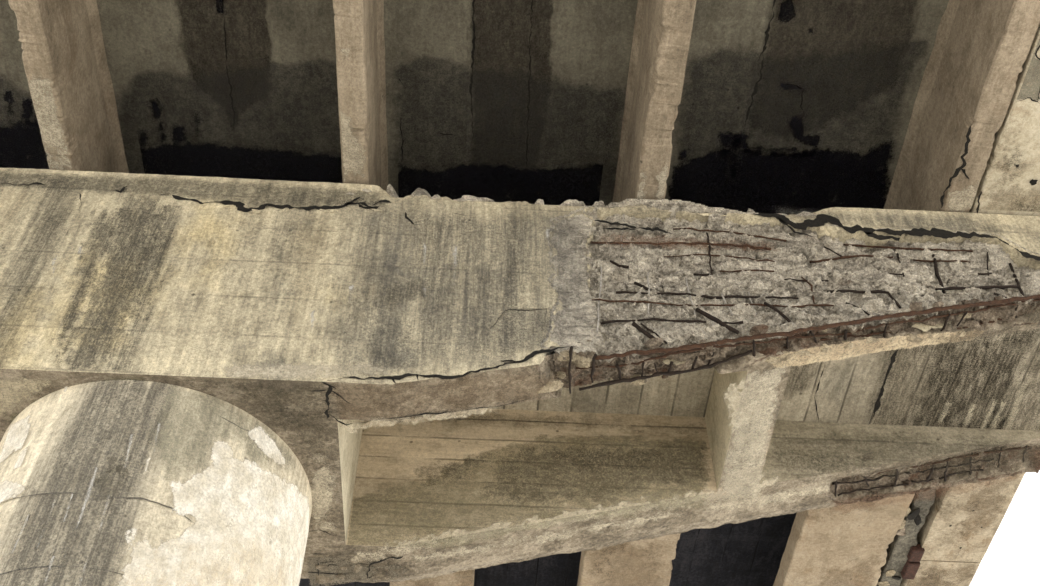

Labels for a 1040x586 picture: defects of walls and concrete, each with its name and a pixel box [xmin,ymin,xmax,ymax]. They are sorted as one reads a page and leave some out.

water stain [396,0,623,204]
water stain [678,0,926,184]
crack [161,194,414,224]
spalling [386,184,441,199]
crack [753,126,1040,261]
water stain [0,0,381,586]
crack [313,308,575,426]
spalling [536,166,1040,505]
crack [7,492,195,524]
peeling [116,426,418,586]
water stain [348,435,829,561]
spalling [877,570,901,586]